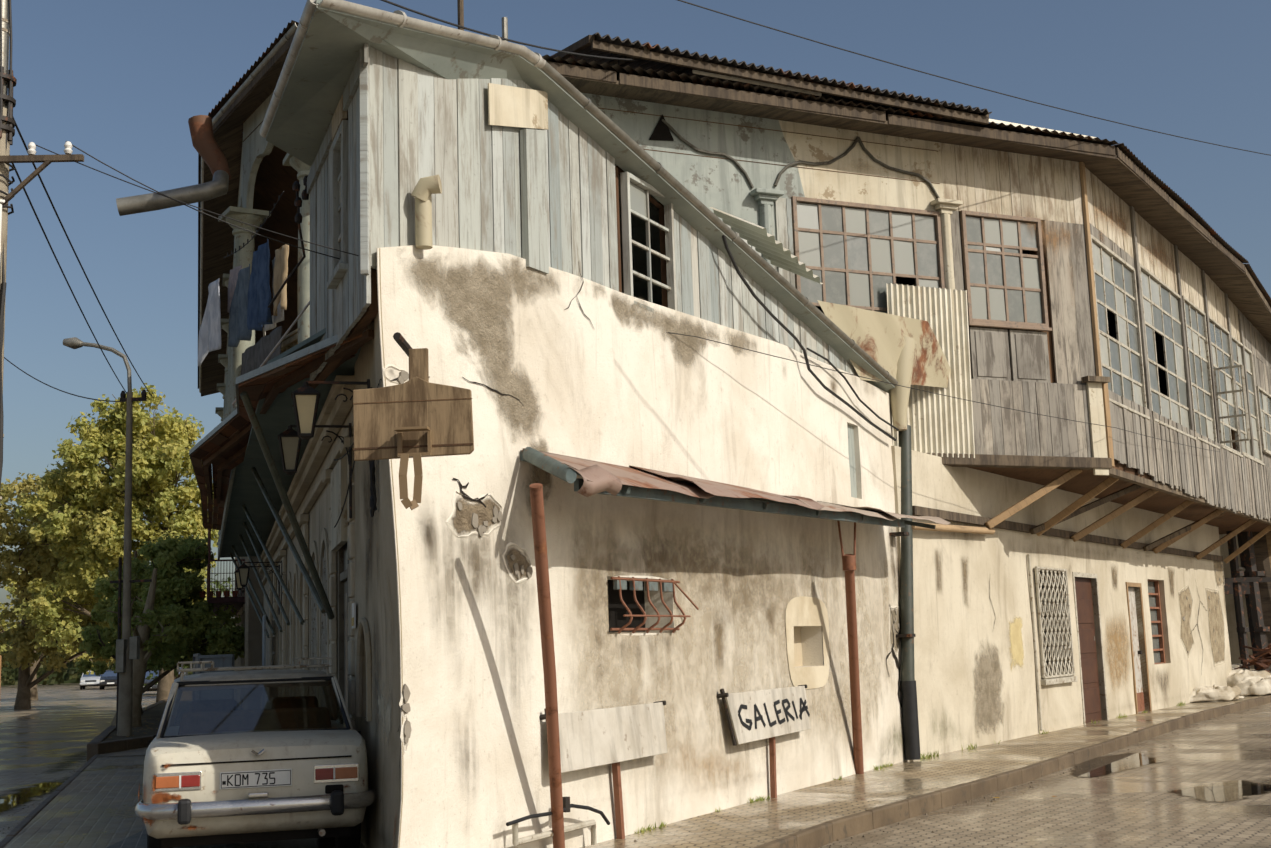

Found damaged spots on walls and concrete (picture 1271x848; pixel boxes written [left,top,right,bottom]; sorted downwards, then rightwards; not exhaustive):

peeling [412,259,555,506]
flaking render [445,490,503,538]
flaking render [501,542,533,584]
water stain [975,648,1002,731]
water stain [1108,625,1127,681]
flaking render [1178,560,1225,667]